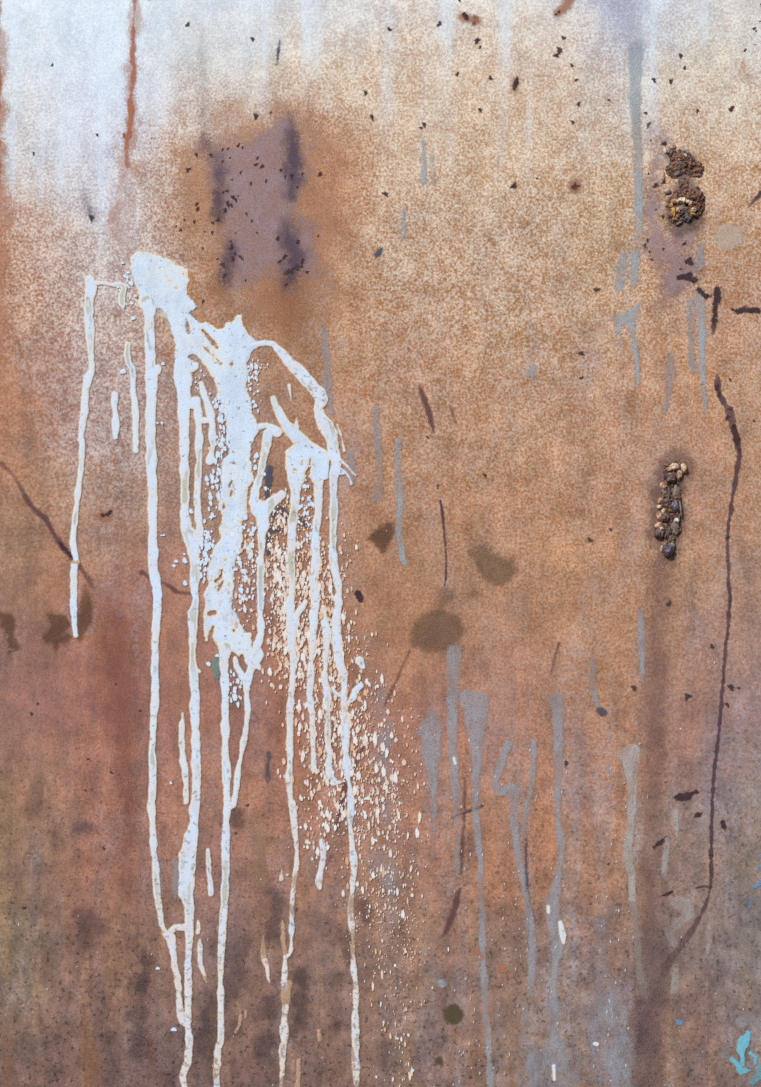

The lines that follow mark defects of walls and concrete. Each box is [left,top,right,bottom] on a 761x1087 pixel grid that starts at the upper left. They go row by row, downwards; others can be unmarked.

rust [123,25,136,167]
rust [175,103,335,319]
rust [570,180,580,193]
rust [643,112,698,292]